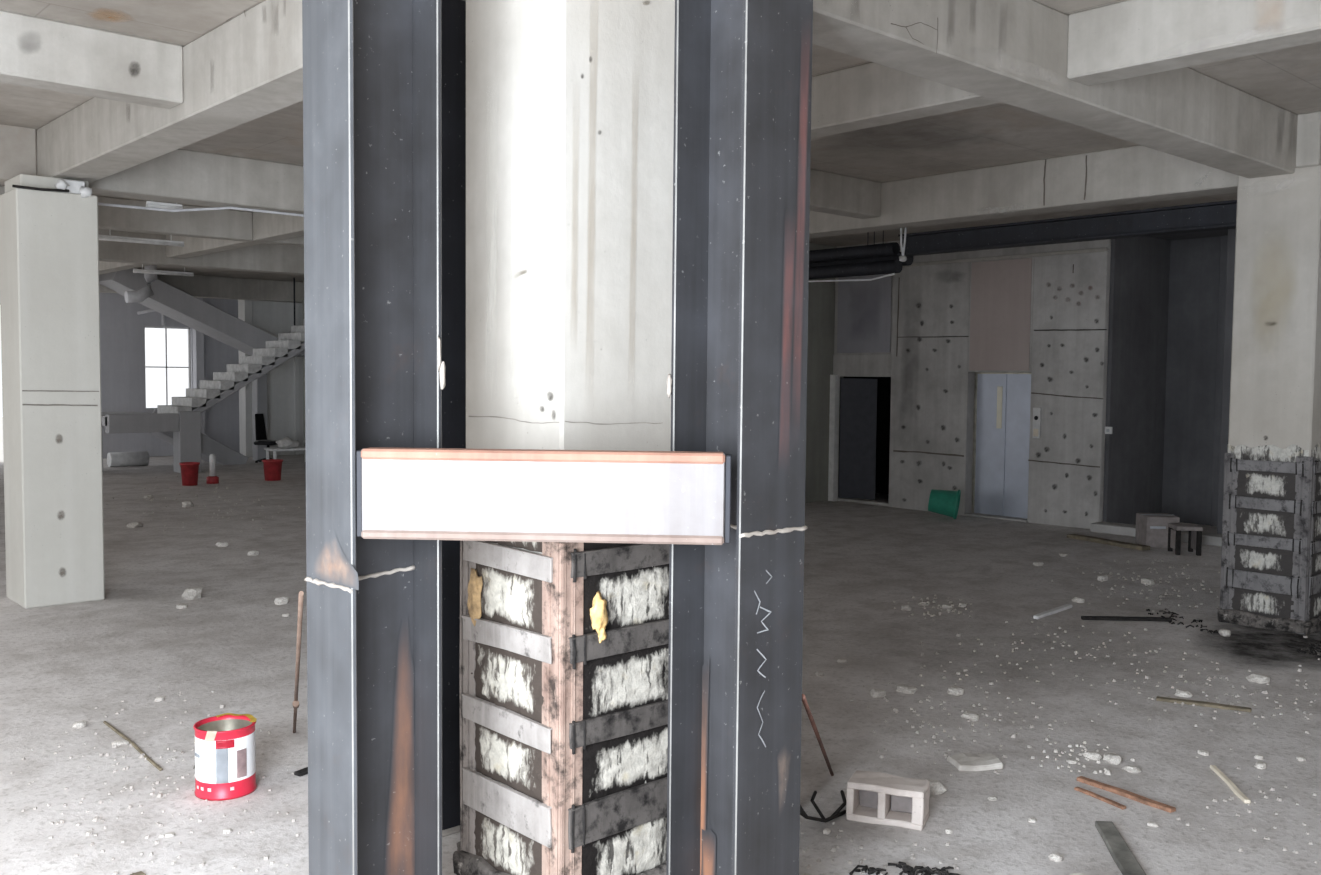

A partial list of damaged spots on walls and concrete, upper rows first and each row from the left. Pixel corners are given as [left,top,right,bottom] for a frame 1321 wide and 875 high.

crack [891,18,938,53]
rust [778,7,811,476]
crack [1040,159,1048,206]
crack [1081,155,1089,200]
rust [384,617,415,875]
rust [700,658,716,875]